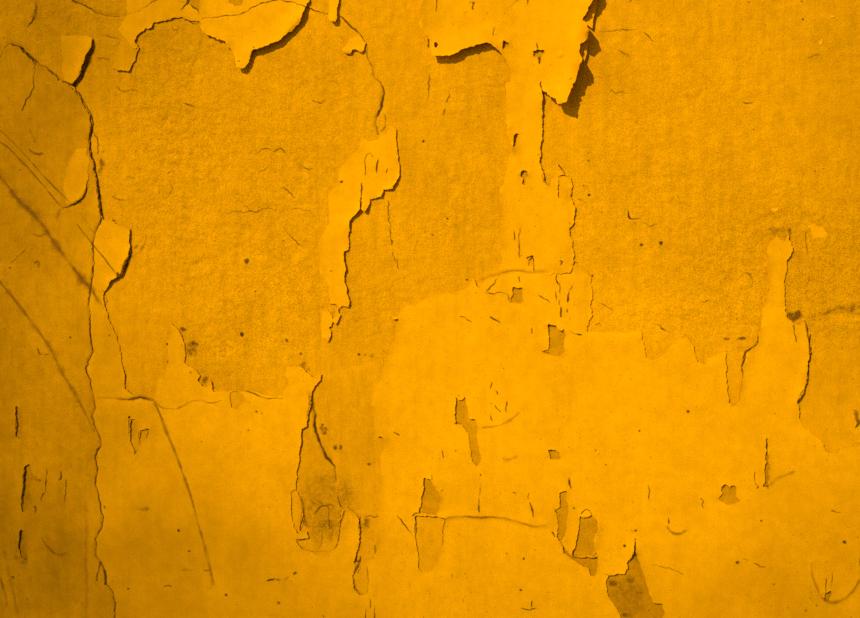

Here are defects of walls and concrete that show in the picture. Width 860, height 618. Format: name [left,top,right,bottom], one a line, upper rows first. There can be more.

peeling [112,0,310,71]
peeling [419,0,597,276]
crack [114,246,137,280]
peeling [319,125,400,342]
crack [2,44,120,618]
spalling [296,359,385,563]
spalling [291,489,305,533]
spalling [415,514,446,573]
spalling [555,491,569,541]
spalling [562,545,598,576]
spalling [572,515,598,557]
spalling [606,553,665,618]